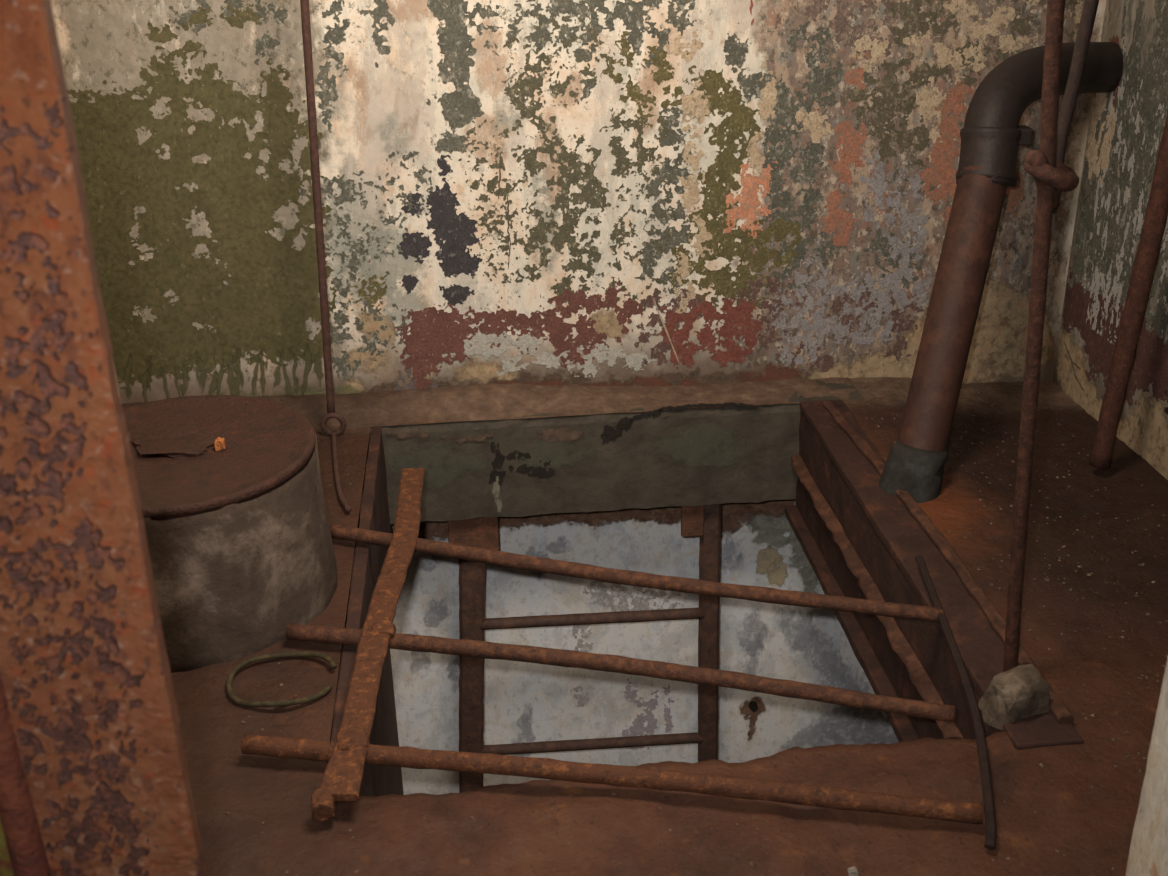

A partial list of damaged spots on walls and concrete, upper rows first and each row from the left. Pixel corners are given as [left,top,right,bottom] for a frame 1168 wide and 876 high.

leakage [682,7,704,110]
leakage [715,0,757,34]
leakage [591,37,619,213]
leakage [56,0,456,402]
leakage [538,197,555,255]
peeling [67,0,1047,392]
peeling [1041,0,1168,421]
leakage [455,273,473,327]
leakage [469,368,754,386]
crack [614,402,759,438]
corrosion [0,91,150,876]